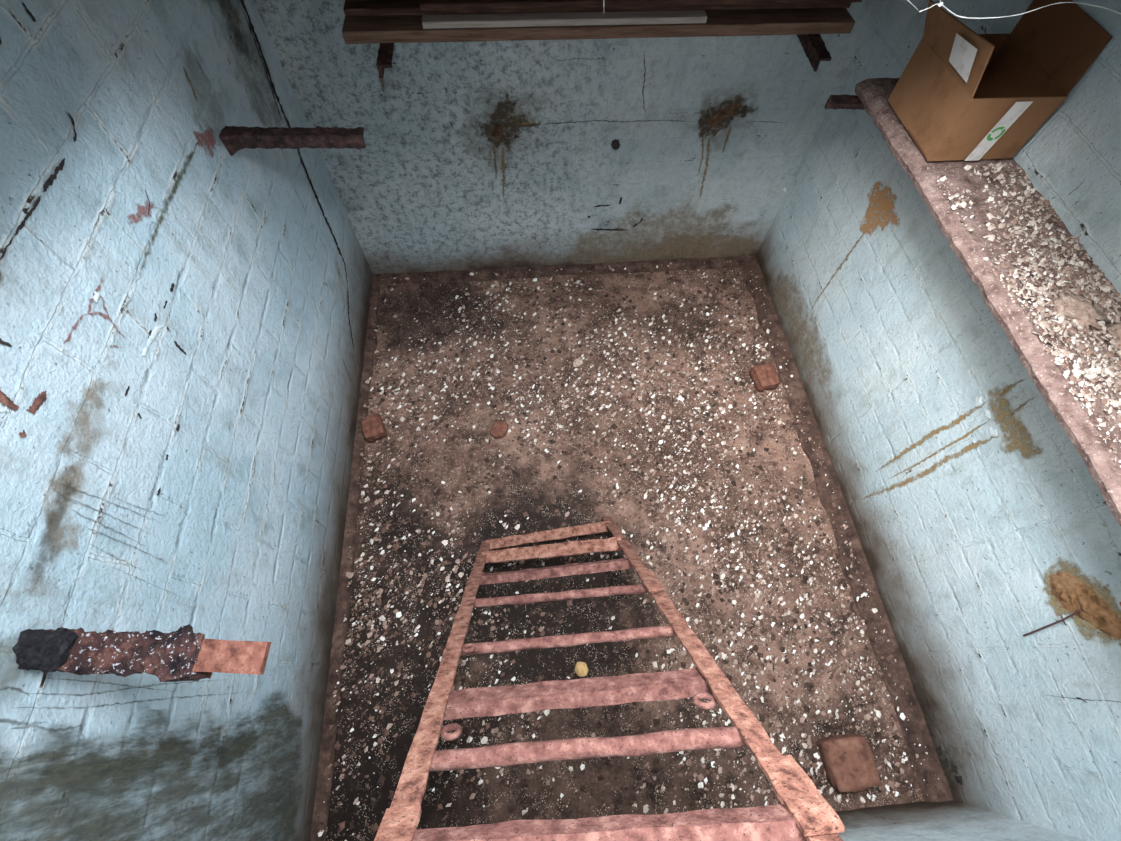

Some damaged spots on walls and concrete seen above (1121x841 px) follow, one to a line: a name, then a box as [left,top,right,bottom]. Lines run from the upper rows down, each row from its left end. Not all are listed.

crack [0,113,77,260]
rust [194,129,216,158]
rust [480,94,540,196]
rust [698,95,754,198]
rust [812,182,899,308]
peeling [0,385,47,414]
rust [864,380,1041,499]
water stain [0,678,301,841]